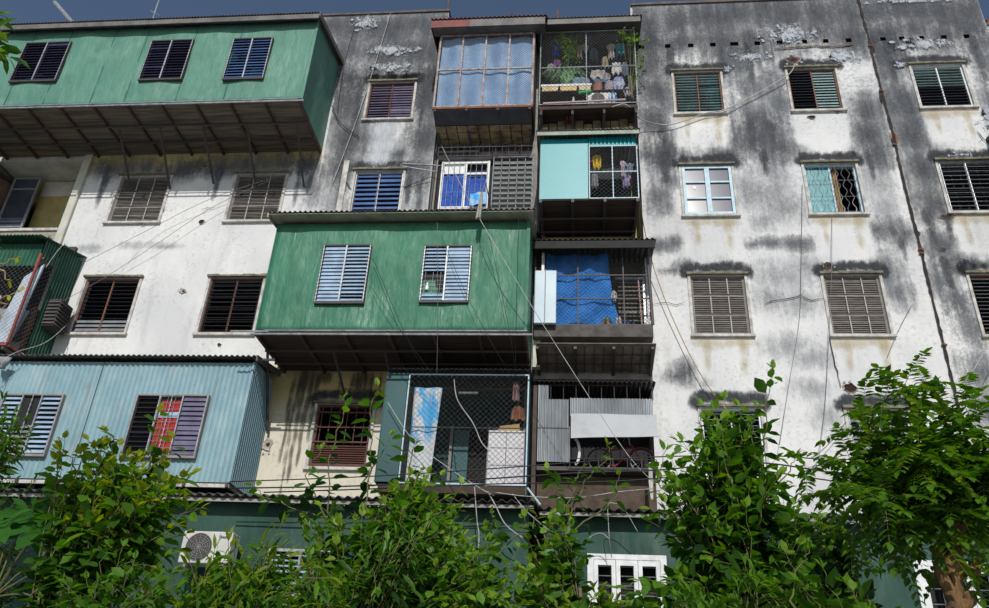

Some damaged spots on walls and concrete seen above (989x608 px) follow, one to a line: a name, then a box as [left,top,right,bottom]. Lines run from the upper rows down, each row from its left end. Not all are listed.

damp [90,12,448,208]
peeling [350,15,377,31]
peeling [368,43,421,72]
peeling [724,23,818,72]
damp [632,0,989,420]
damp [280,371,384,491]